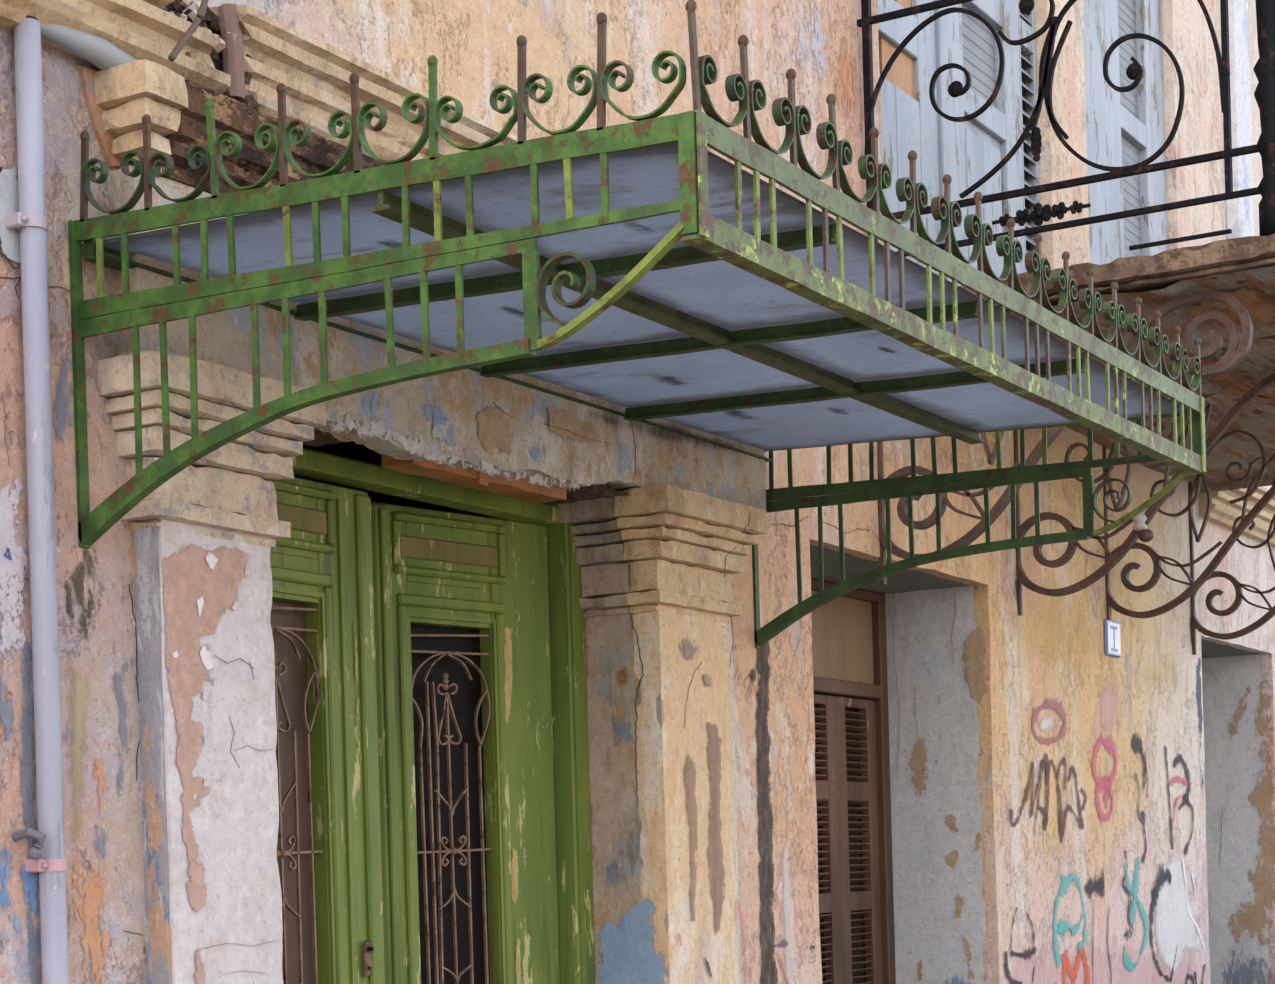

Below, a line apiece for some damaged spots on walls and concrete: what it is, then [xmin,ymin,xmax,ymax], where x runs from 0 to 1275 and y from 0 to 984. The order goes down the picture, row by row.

flaking render [0,166,21,269]
peeling [162,544,251,932]
crack [629,606,644,808]
peeling [909,737,938,795]
peeling [0,848,39,934]
water stain [684,722,725,936]
peeling [944,814,957,832]
peeling [946,850,959,867]
peeling [1227,682,1275,944]
peeling [195,949,205,984]
peeling [598,899,668,984]
peeling [943,935,975,984]